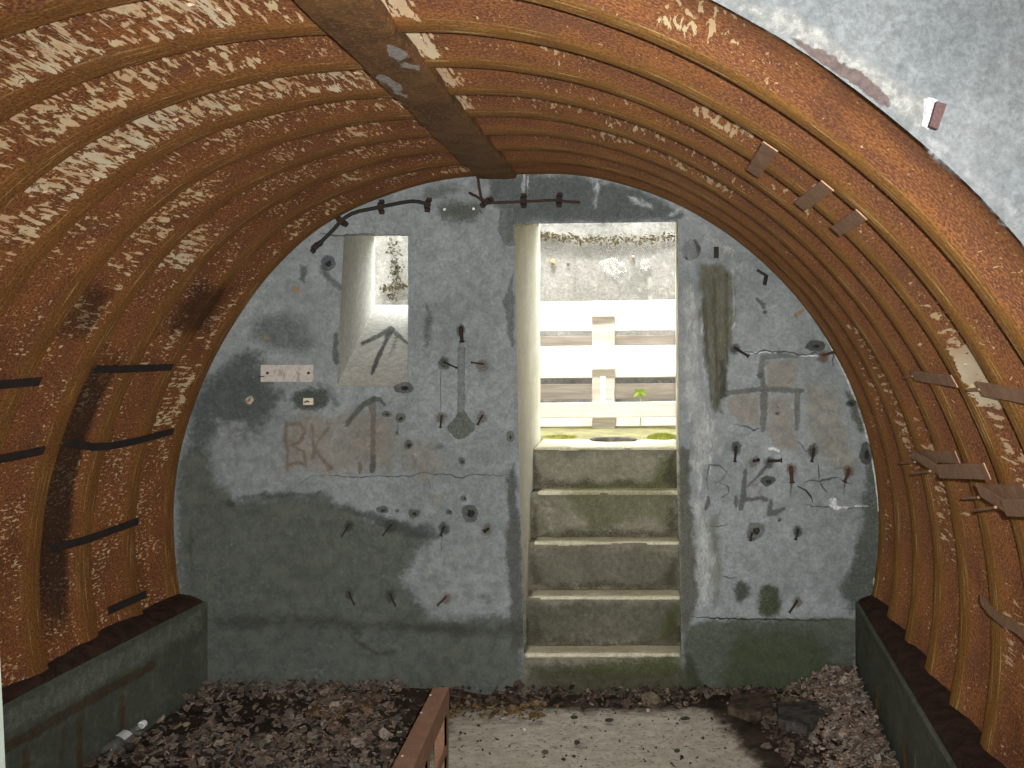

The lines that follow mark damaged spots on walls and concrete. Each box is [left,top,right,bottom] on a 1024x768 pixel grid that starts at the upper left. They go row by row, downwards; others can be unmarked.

peeling [0,17,105,91]
peeling [91,0,236,43]
peeling [317,71,376,93]
peeling [381,0,474,110]
corrosion [794,38,890,107]
peeling [24,84,251,206]
peeling [158,240,208,272]
spalling [320,255,336,273]
crack [744,349,821,357]
peeling [946,338,1004,410]
leakage [3,265,879,734]
crack [796,441,867,509]